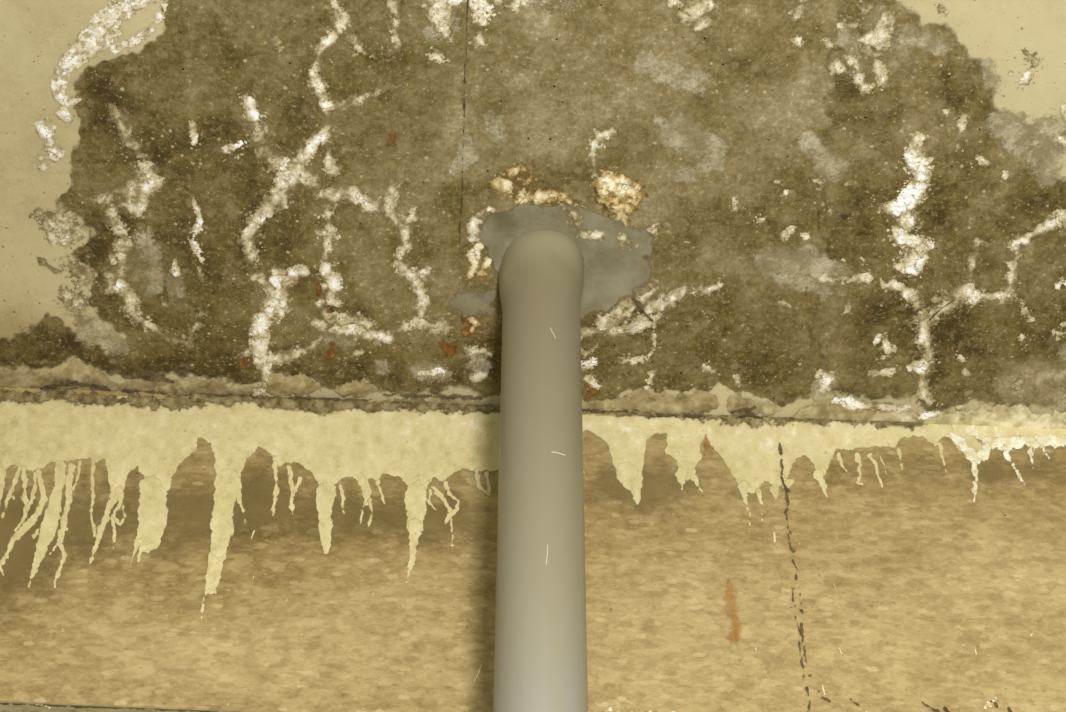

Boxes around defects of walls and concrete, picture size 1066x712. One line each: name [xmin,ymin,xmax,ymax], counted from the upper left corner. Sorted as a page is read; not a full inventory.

water stain [0,0,1066,517]
water stain [0,396,500,621]
crack [582,409,705,418]
crack [731,406,763,419]
crack [778,443,820,709]
crack [0,703,217,712]